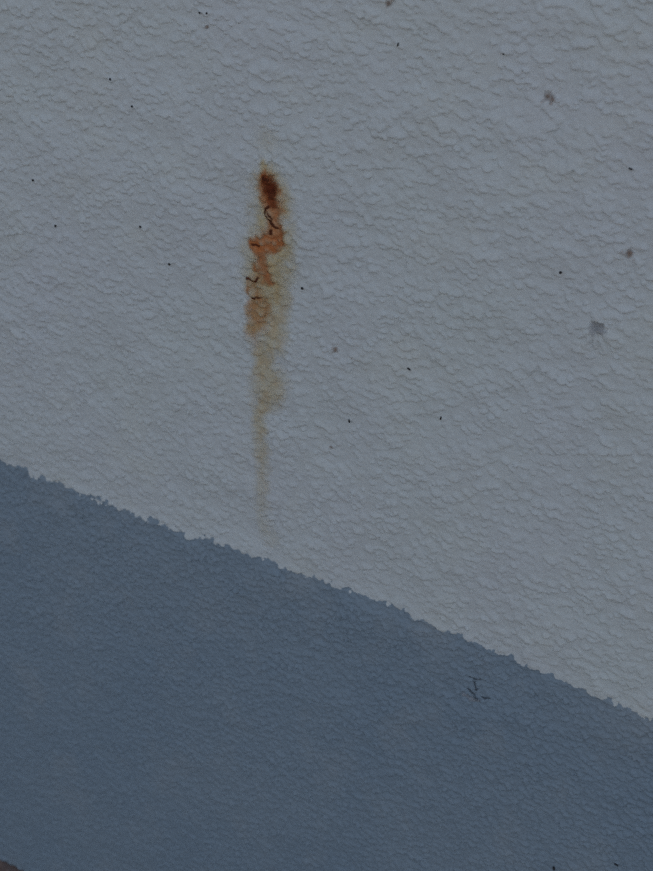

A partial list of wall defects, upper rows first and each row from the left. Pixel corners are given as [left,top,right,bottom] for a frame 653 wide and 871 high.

rust [245,161,290,413]